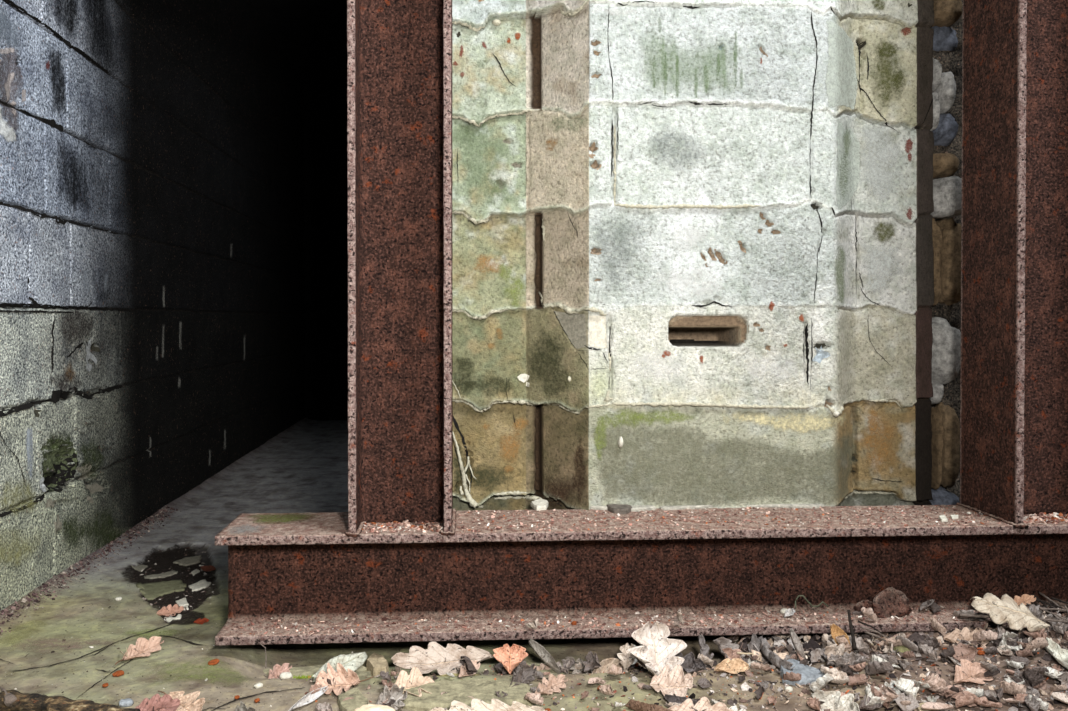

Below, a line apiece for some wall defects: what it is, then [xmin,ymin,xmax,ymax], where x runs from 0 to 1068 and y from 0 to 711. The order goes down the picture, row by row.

leakage [55,0,113,68]
flaking render [0,48,26,141]
leakage [50,52,65,110]
crack [0,201,118,234]
leakage [60,145,86,207]
spalling [589,142,602,170]
crack [803,1,933,389]
spalling [554,311,607,349]
crack [0,246,137,517]
leakage [601,427,854,504]
corrosion [362,519,444,533]